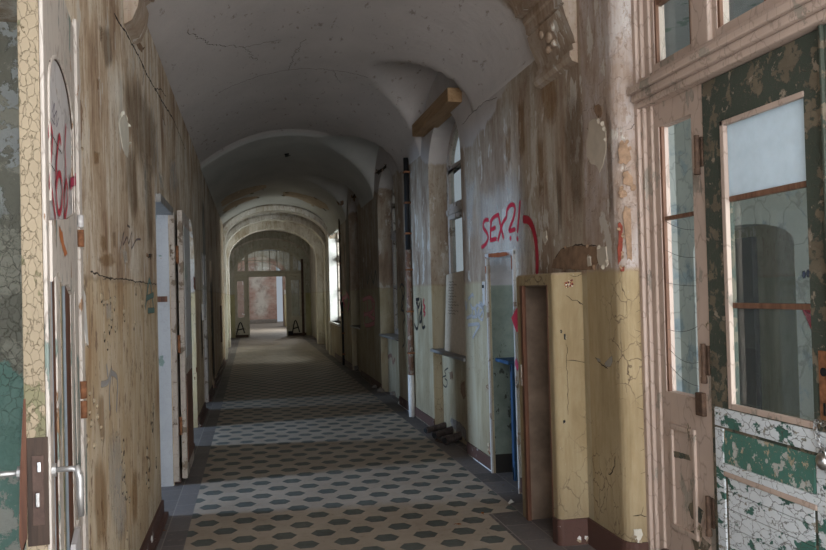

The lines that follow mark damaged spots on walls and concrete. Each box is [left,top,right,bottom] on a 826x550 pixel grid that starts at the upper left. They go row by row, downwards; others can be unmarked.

crack [114,13,185,149]
peeling [586,104,607,173]
spalling [552,140,636,272]
crack [90,271,156,289]
crack [566,339,608,408]